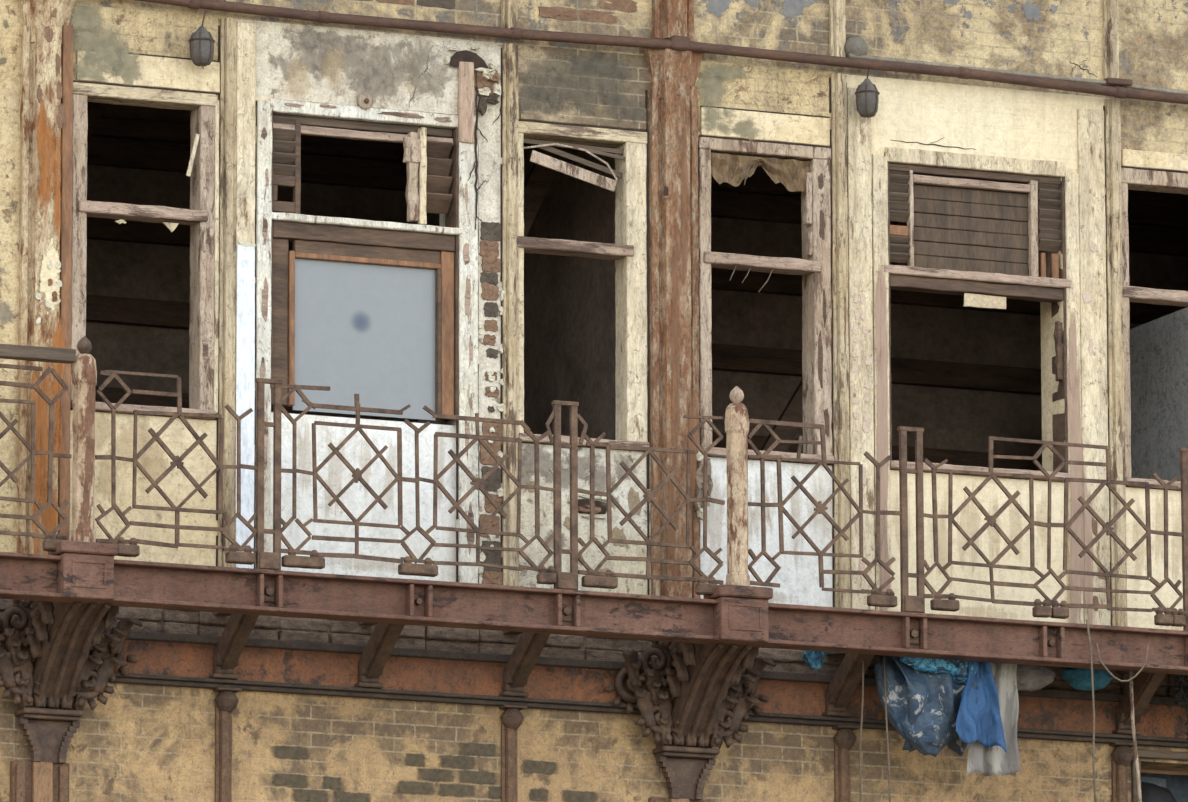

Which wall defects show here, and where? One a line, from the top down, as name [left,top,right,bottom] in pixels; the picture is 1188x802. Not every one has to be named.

peeling [44,8,65,129]
flaking render [538,0,638,24]
spalling [35,236,62,325]
spalling [463,222,507,585]